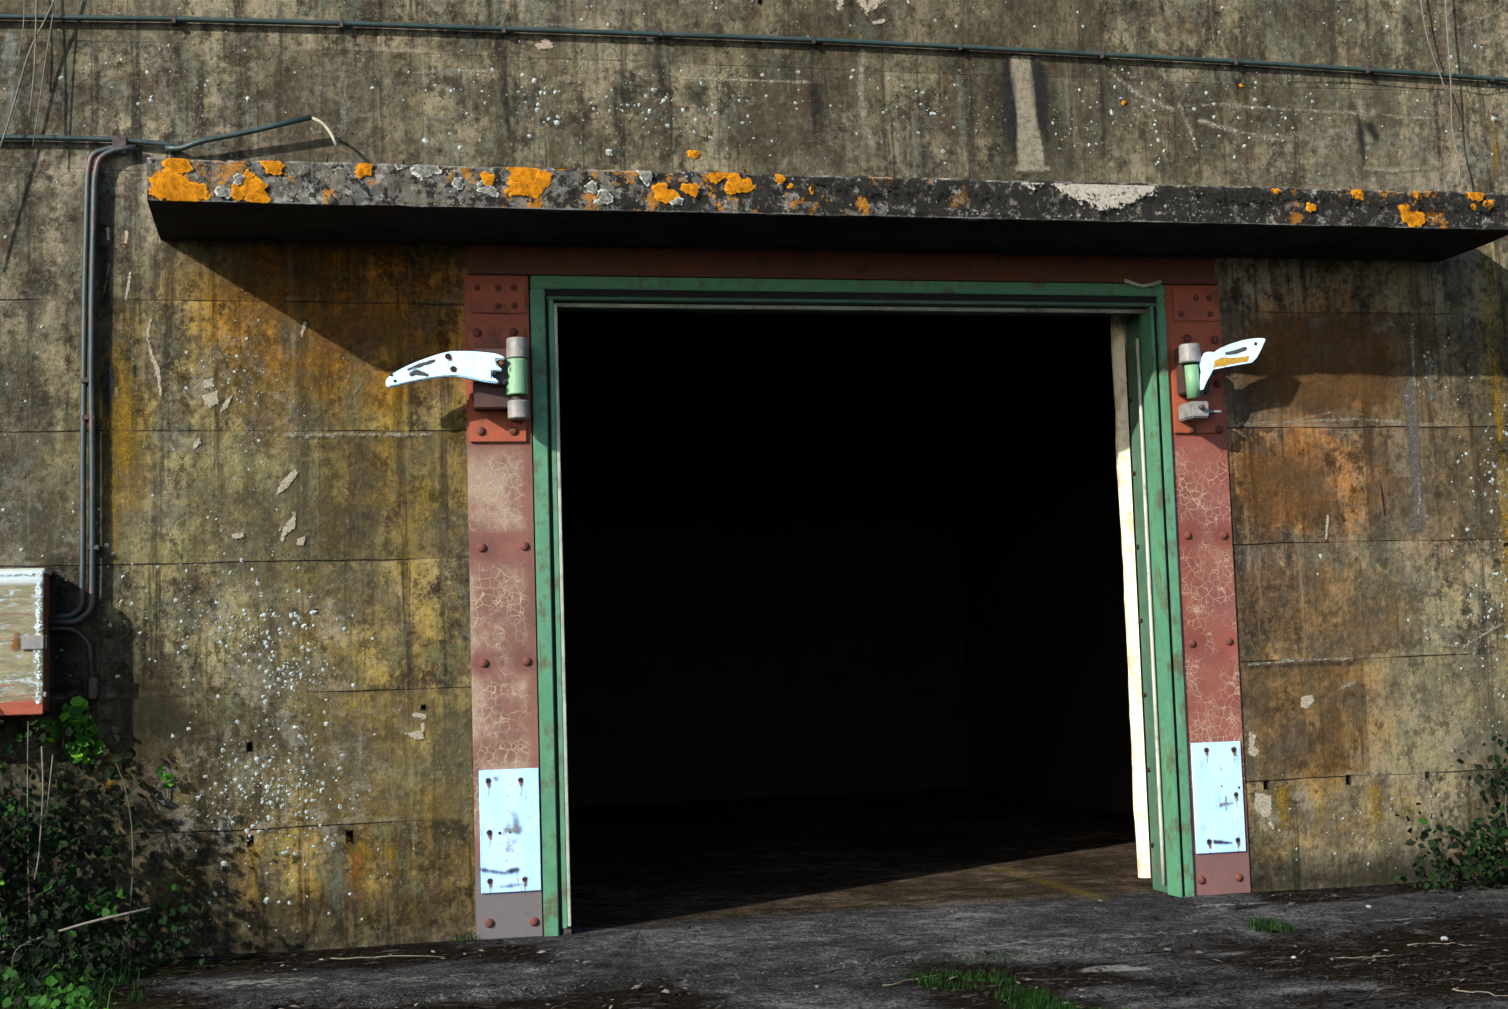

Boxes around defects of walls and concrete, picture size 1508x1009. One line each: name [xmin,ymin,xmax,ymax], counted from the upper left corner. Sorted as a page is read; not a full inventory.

leakage [99,227,131,303]
leakage [101,361,136,412]
leakage [110,682,203,744]